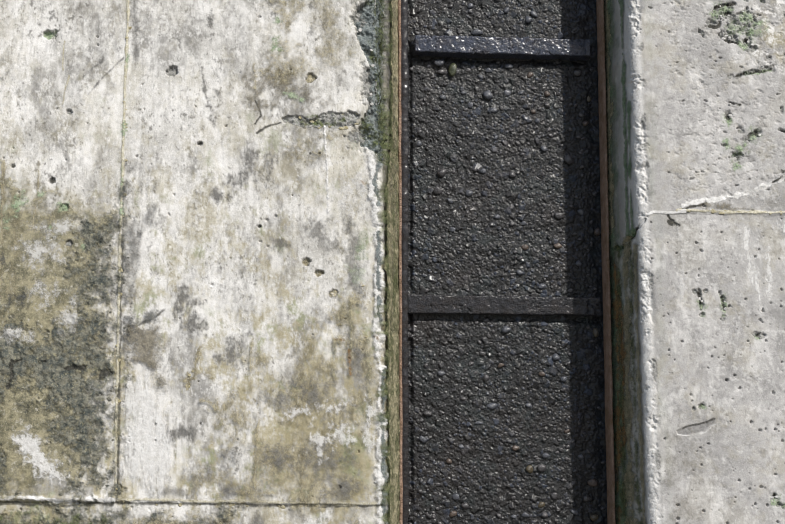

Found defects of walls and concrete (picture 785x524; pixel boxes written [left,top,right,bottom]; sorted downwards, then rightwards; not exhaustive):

damp [213,0,400,524]
spalling [255,0,389,524]
crack [614,169,785,263]
damp [0,160,141,502]
damp [122,310,167,386]
damp [173,286,207,336]
damp [167,425,194,442]
damp [162,474,219,495]